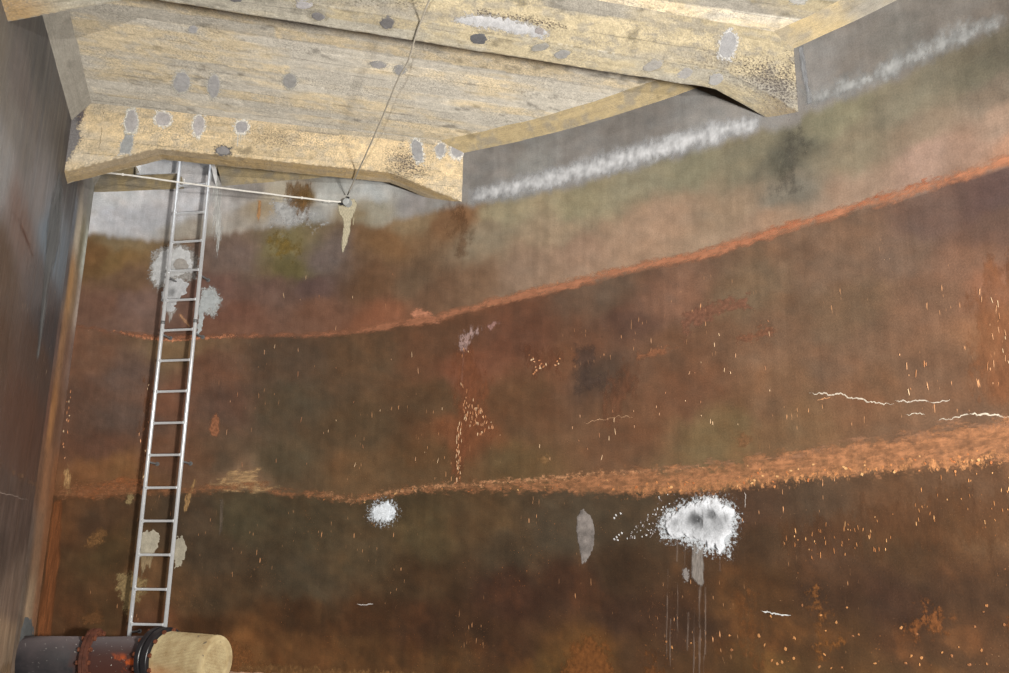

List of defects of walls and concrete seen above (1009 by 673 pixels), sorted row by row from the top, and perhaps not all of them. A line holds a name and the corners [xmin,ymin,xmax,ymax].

leakage [477,9,569,31]
leakage [733,50,798,115]
leakage [811,20,998,102]
leakage [472,118,758,201]
leakage [269,198,325,227]
leakage [338,199,357,252]
corrosion [276,157,1009,337]
corrosion [91,327,261,342]
crack [813,392,1009,420]
corrosion [38,416,1009,639]